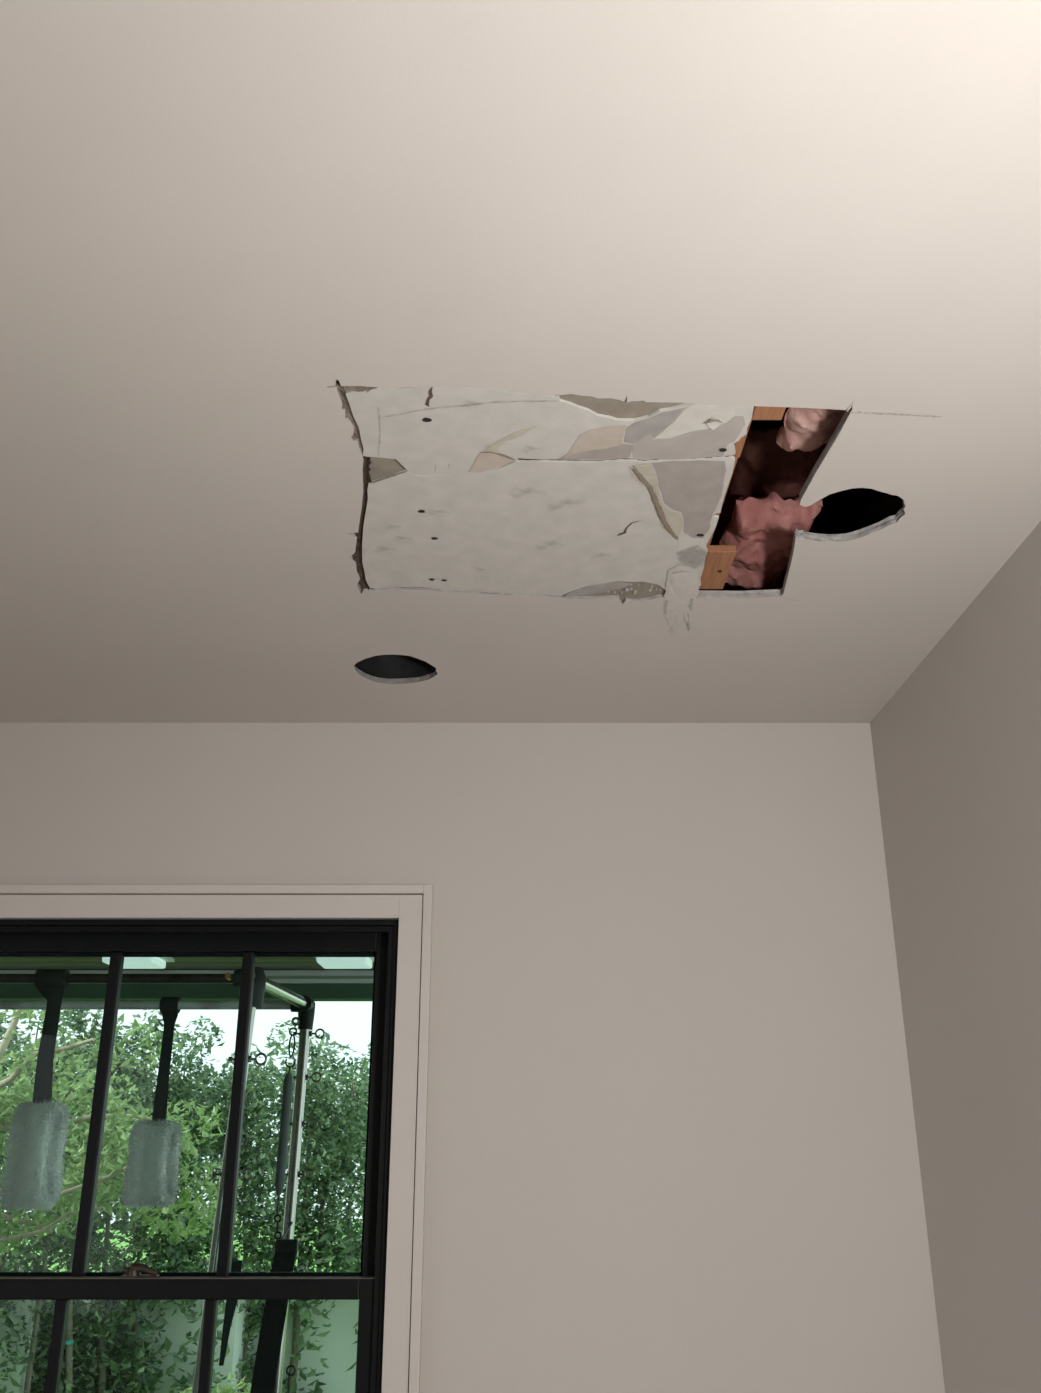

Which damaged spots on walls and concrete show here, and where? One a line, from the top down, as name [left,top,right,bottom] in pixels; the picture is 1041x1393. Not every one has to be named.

spalling [327,384,664,604]
hole [799,403,852,501]
hole [696,500,905,598]